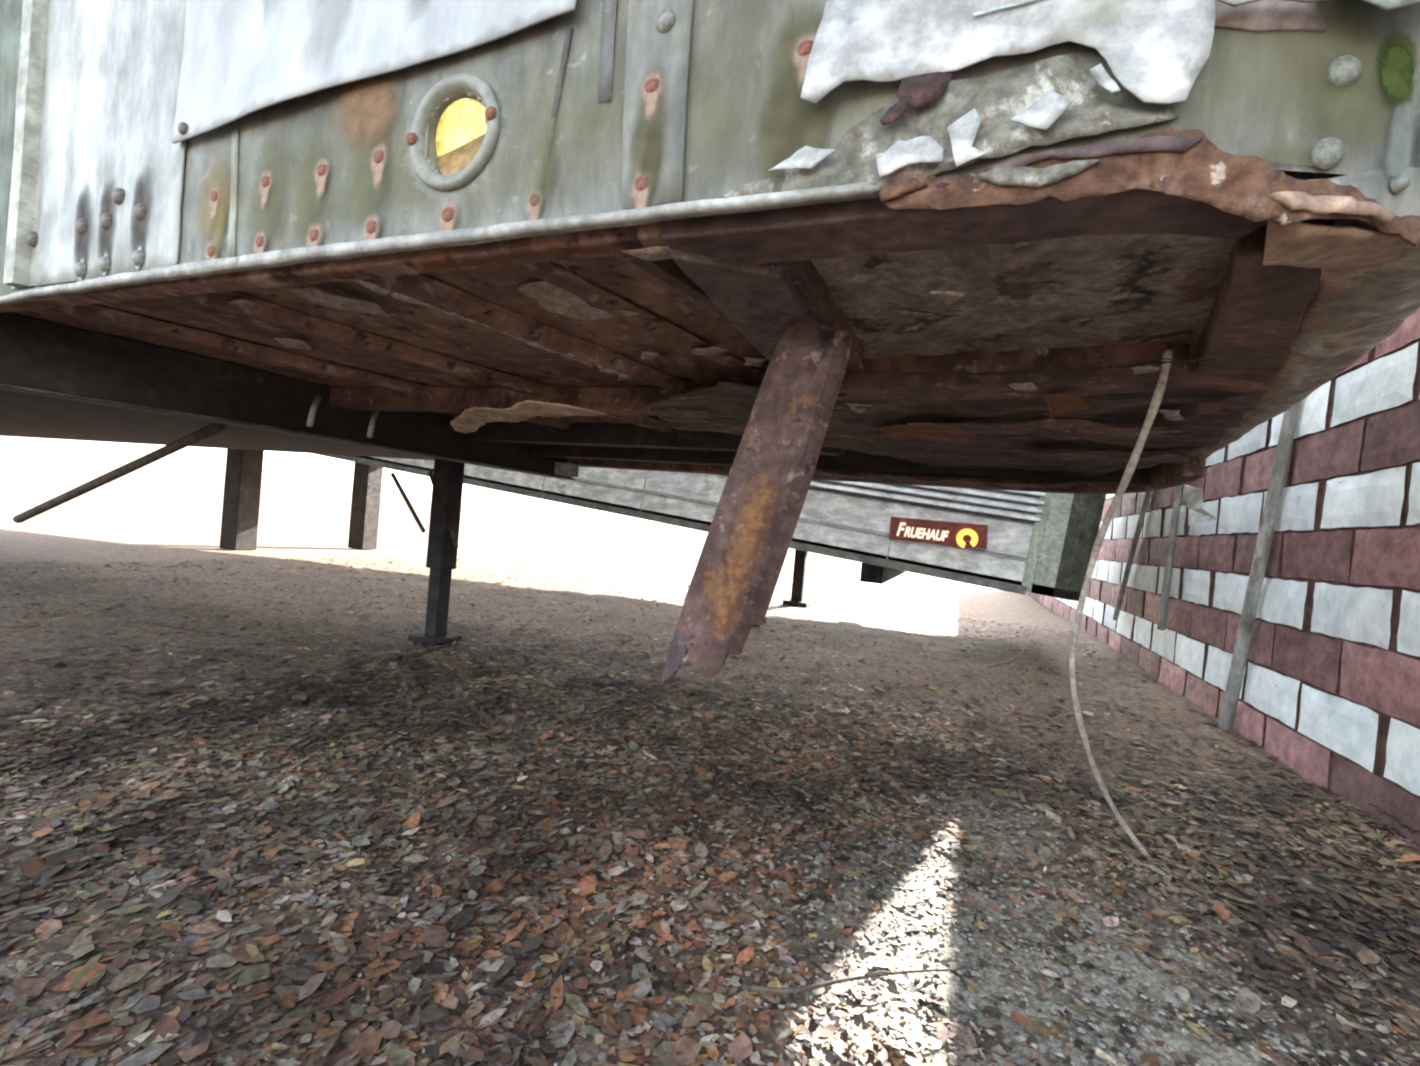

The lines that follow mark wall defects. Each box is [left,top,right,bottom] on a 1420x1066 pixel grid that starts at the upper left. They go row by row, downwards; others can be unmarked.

rust [711,476,774,629]